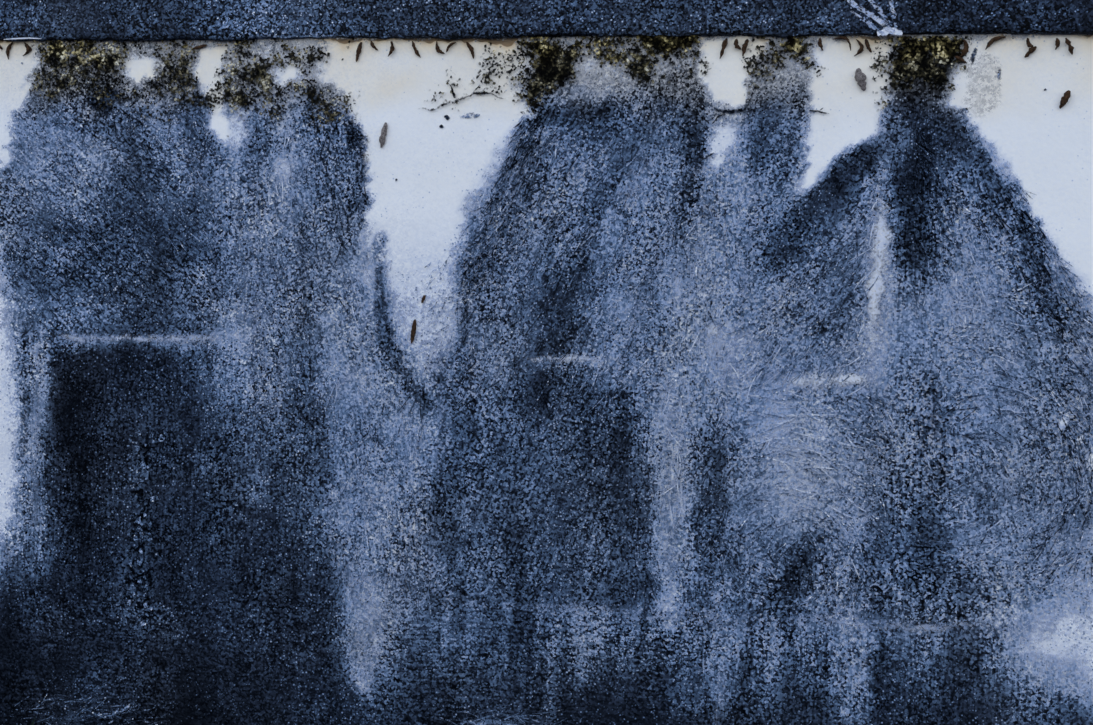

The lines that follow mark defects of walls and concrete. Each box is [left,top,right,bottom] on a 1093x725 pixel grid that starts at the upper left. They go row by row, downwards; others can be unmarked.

water stain [968,48,1001,112]
water stain [871,488,901,531]